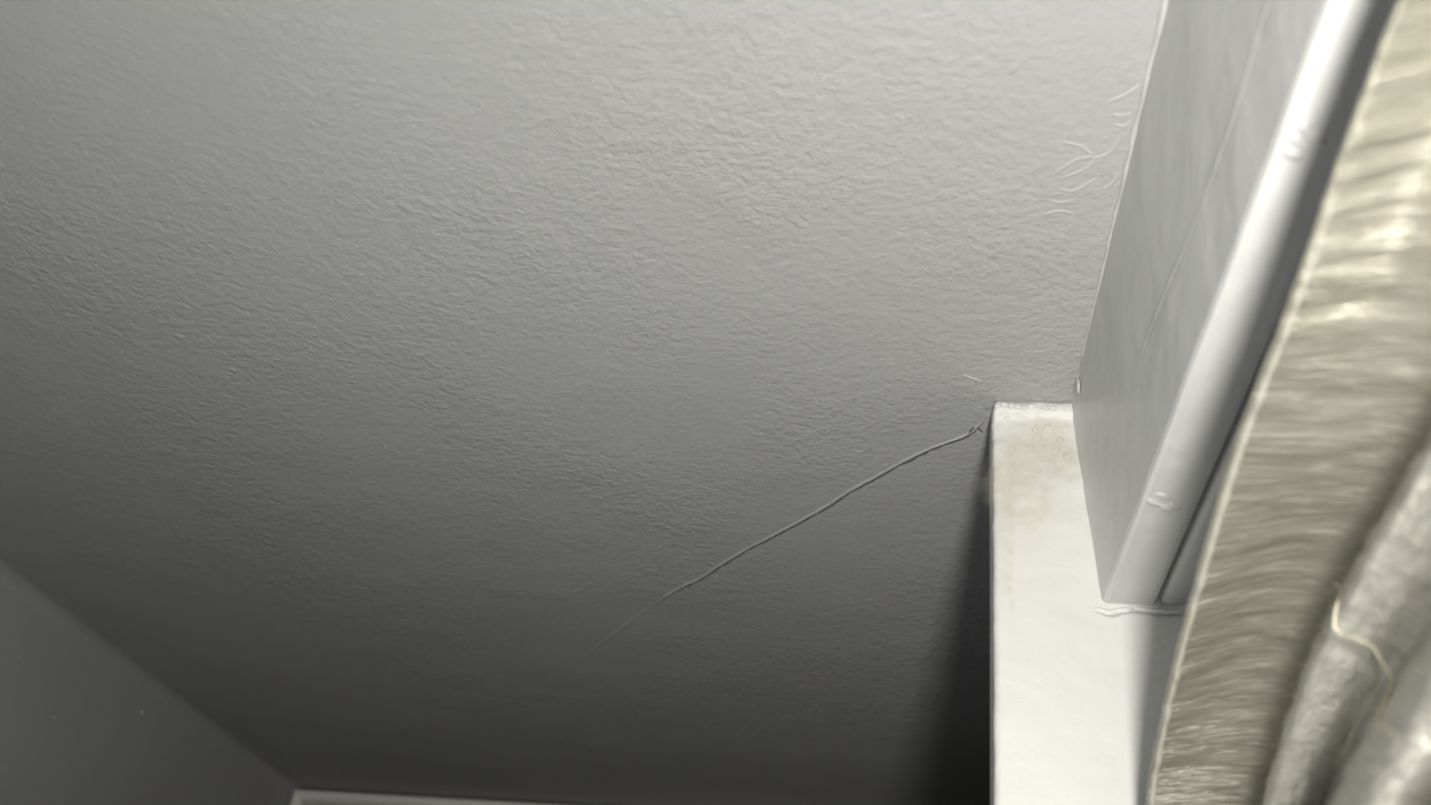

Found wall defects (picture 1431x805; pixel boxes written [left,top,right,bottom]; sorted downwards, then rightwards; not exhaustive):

crack [577,419,985,664]